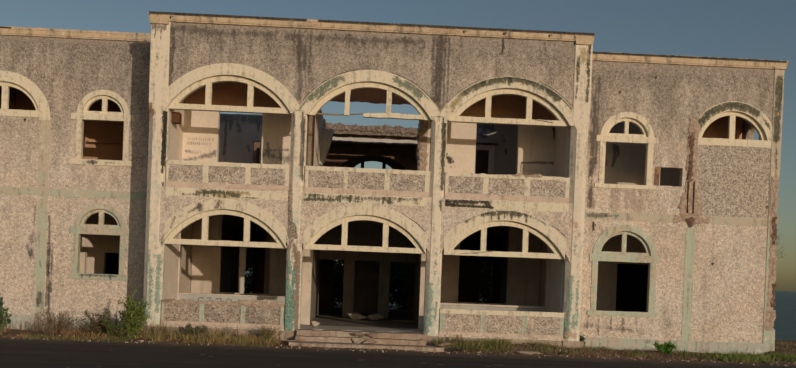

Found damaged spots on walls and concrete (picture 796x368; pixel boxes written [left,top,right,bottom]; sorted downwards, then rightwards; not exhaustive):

leakage [0,11,595,173]
leakage [36,216,53,315]
leakage [445,199,546,225]
spalling [672,116,711,228]
spalling [764,176,780,331]